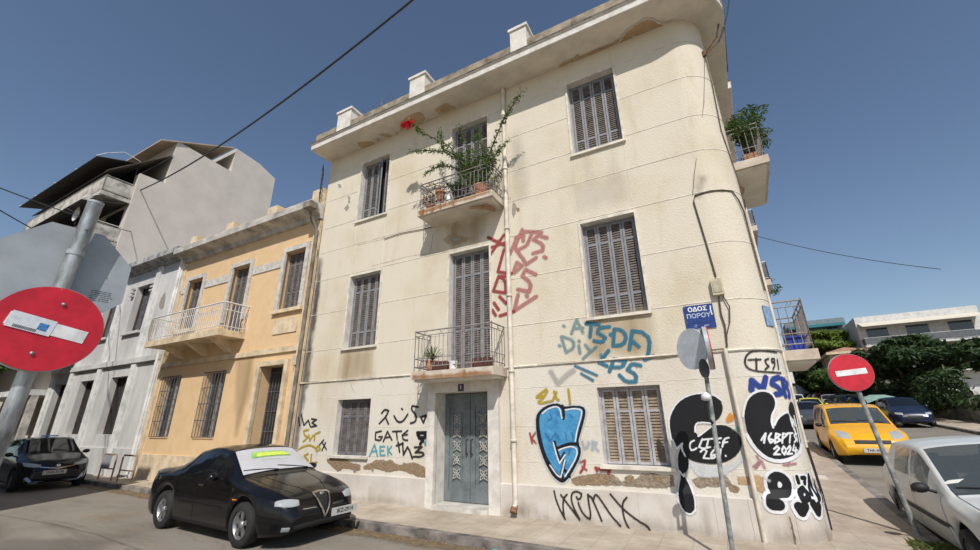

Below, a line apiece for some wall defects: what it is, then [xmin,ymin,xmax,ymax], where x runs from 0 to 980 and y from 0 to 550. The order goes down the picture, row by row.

spalling [327,458,425,478]
spalling [571,473,675,489]